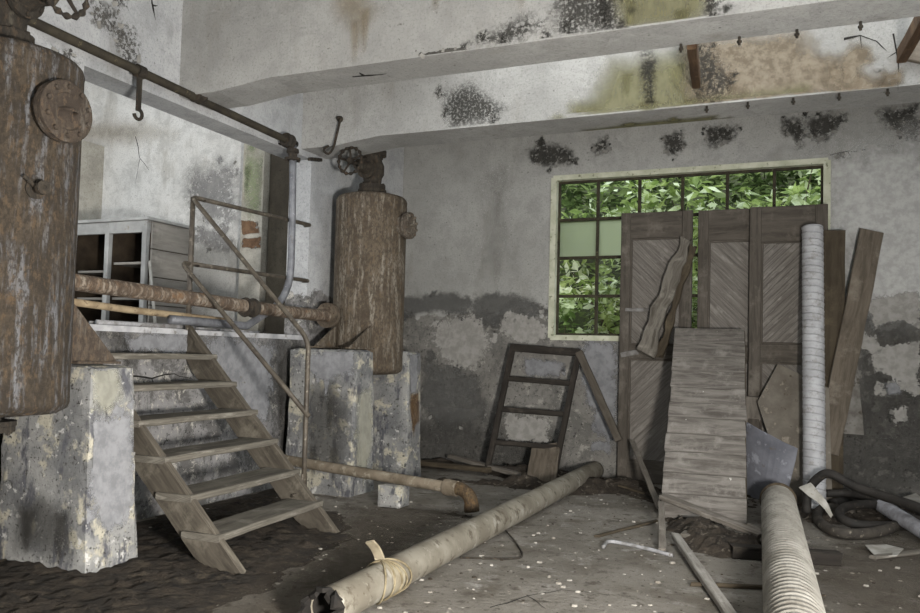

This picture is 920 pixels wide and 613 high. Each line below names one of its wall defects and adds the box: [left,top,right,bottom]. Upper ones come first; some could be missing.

water stain [555,0,731,34]
water stain [571,33,873,114]
water stain [435,86,501,126]
water stain [530,137,578,172]
water stain [660,130,686,161]
water stain [701,124,742,147]
water stain [782,111,847,146]
peeling [861,291,920,398]
corrosion [410,394,419,432]
peeling [889,405,910,426]